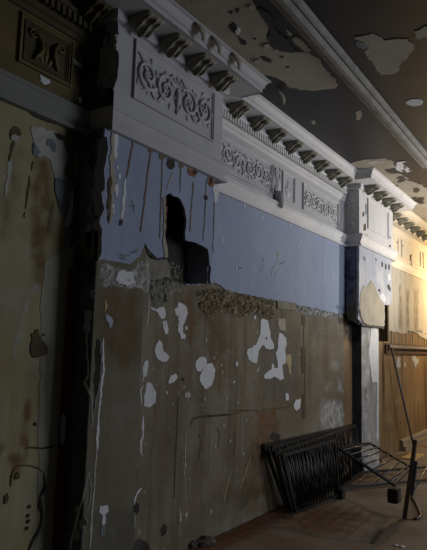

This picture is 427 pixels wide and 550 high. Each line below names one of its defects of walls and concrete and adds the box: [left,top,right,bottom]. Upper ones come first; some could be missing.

peeling [174,0,338,91]
peeling [354,26,427,75]
peeling [31,126,71,216]
peeling [351,158,427,222]
flaking render [30,329,48,358]
peeling [154,340,169,362]
peeling [174,302,188,339]
crack [191,315,306,447]
flaking render [195,258,391,438]
crack [10,465,47,550]